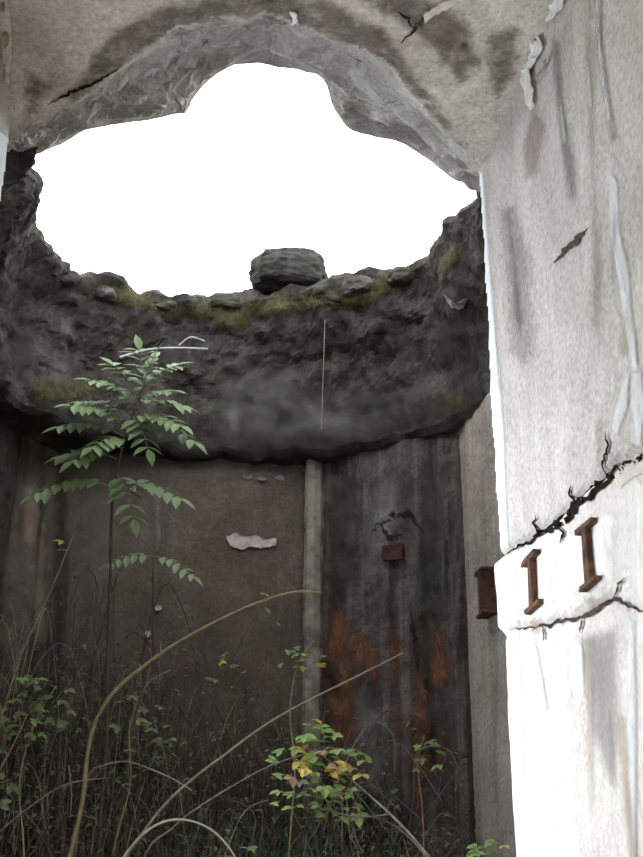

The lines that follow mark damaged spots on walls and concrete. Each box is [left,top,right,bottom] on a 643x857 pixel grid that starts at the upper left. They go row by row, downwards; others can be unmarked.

crack [47,67,119,106]
water stain [82,0,445,126]
water stain [377,0,478,78]
crack [397,0,464,44]
water stain [491,29,517,91]
peeling [520,36,546,110]
peeling [545,0,564,26]
crack [506,431,643,554]
peeling [226,533,277,550]
crack [511,577,643,640]
rust [326,611,399,802]
rust [399,625,452,808]